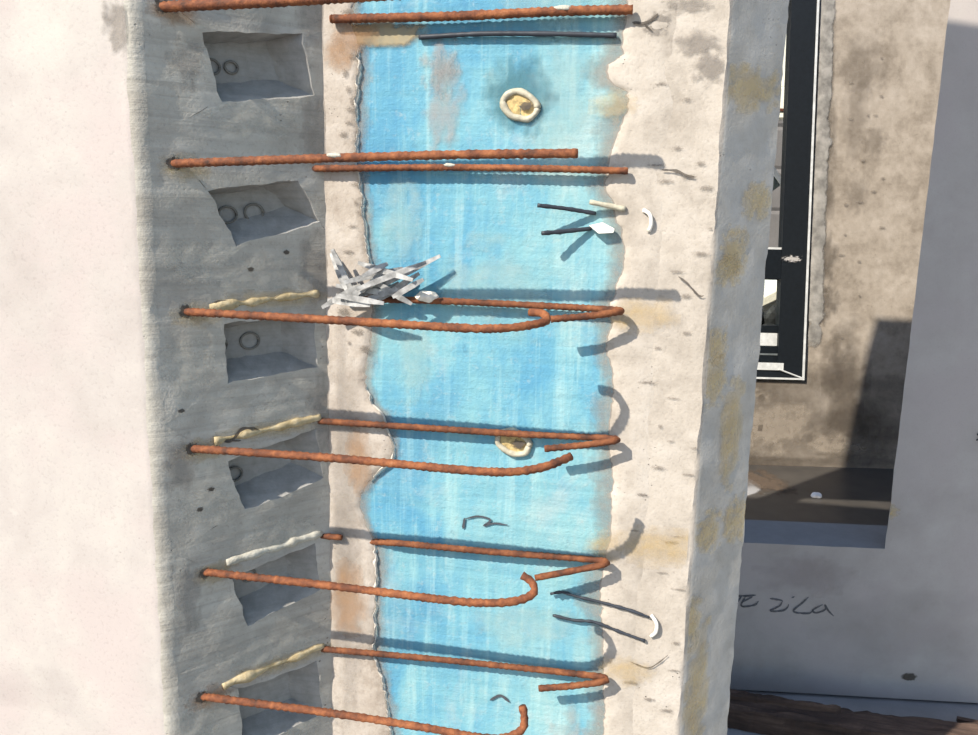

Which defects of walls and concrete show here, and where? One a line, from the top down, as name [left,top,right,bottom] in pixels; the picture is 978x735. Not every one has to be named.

peeling [155,0,723,735]
leakage [589,0,630,735]
leakage [744,405,894,526]